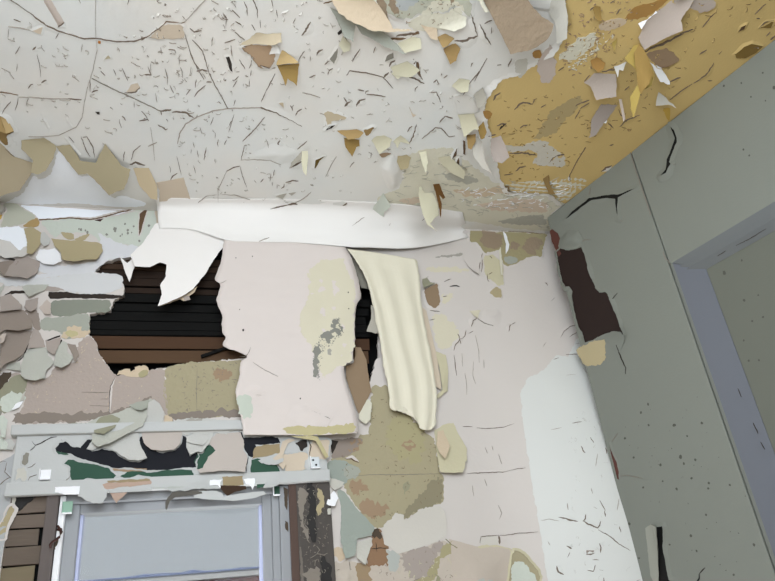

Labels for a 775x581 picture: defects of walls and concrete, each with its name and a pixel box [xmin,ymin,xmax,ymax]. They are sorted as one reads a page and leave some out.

peeling [146,22,188,41]
peeling [237,33,299,86]
peeling [322,0,775,366]
flaking render [0,112,241,424]
peeling [20,451,31,467]
flaking render [55,385,467,581]
peeling [0,497,18,541]
flaking render [507,548,543,581]
peeling [645,524,659,581]